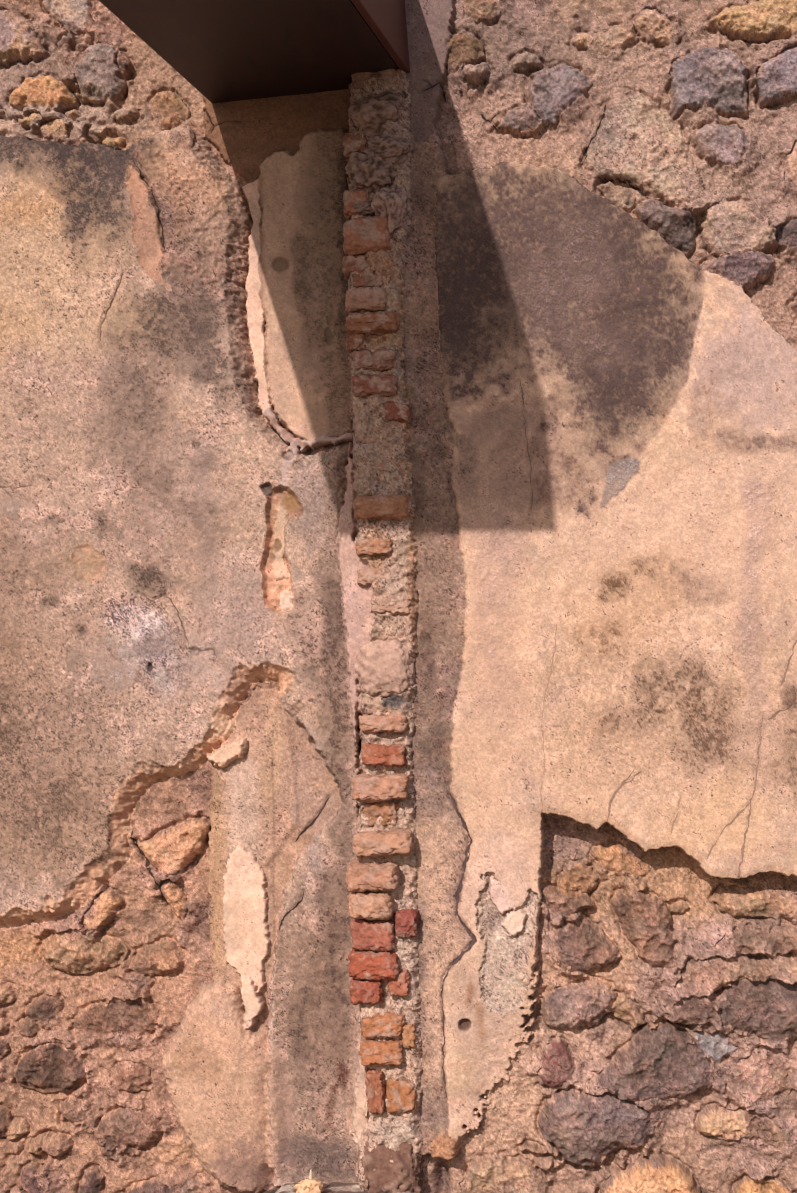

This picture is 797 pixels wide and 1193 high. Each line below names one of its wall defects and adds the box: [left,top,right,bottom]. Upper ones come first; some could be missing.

leakage [0,134,159,246]
leakage [414,162,702,465]
leakage [535,449,597,515]
leakage [719,432,797,451]
flaking render [260,486,305,615]
flaking render [207,738,249,768]
crack [707,640,797,878]
flaking render [222,846,271,1029]
crack [441,796,477,1097]